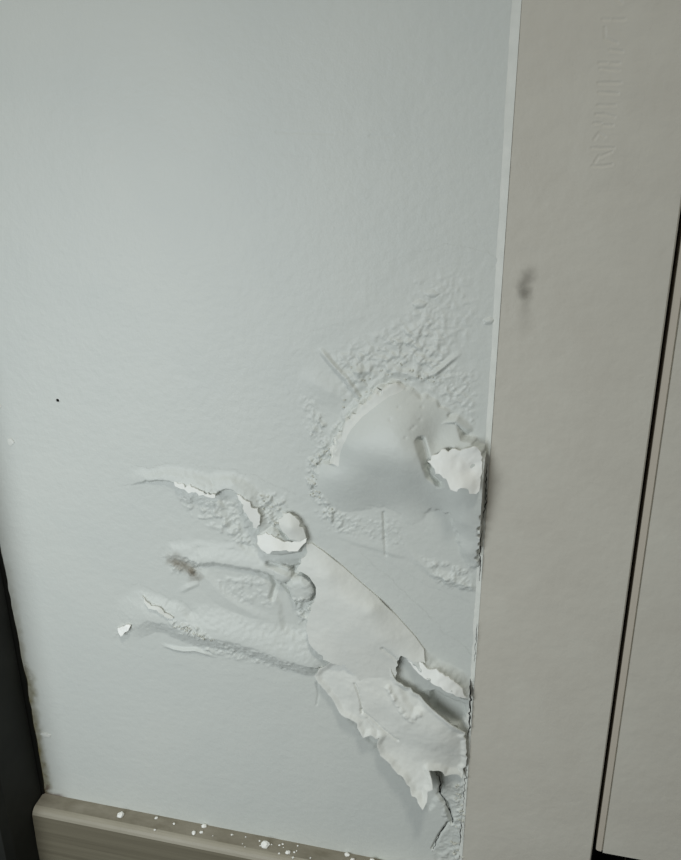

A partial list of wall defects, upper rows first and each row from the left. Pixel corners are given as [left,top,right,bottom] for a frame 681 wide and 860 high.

peeling [113,463,472,860]